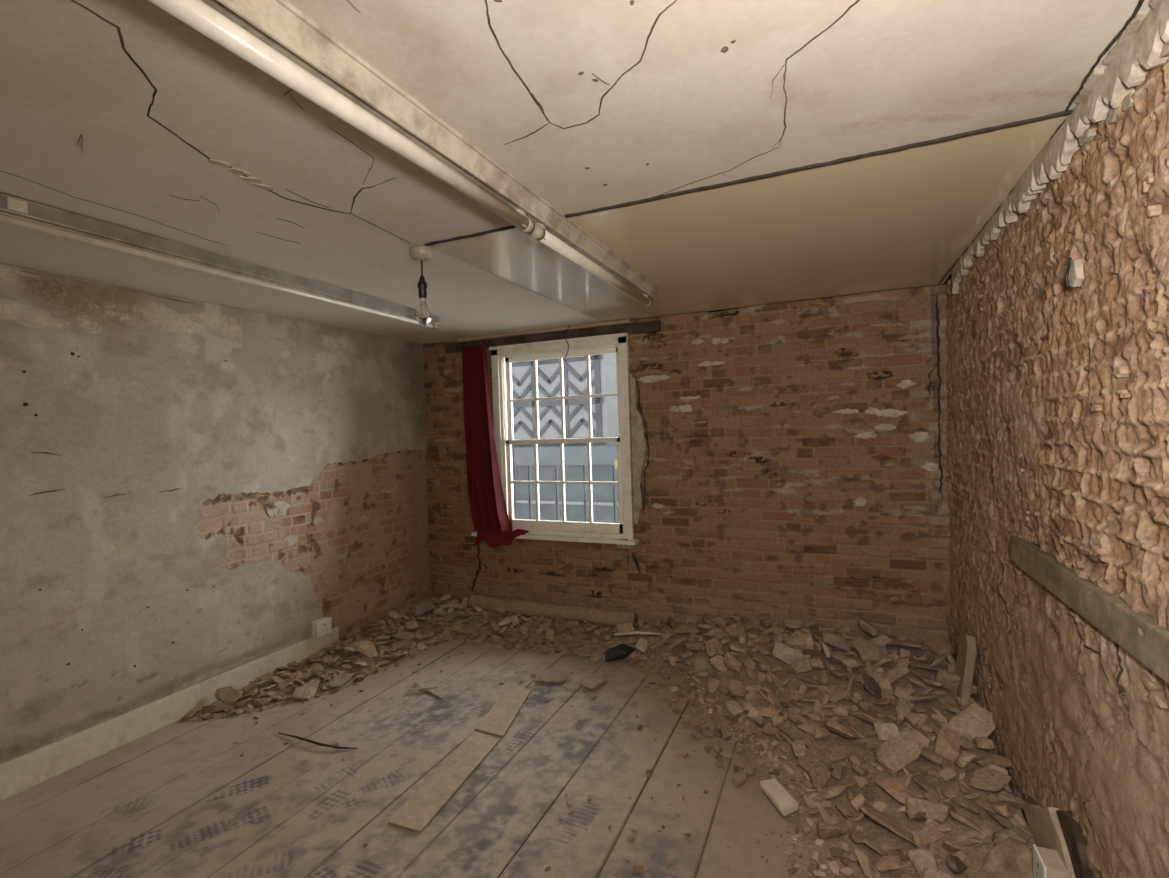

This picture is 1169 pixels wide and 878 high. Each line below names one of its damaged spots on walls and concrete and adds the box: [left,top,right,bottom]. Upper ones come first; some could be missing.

crack [1,171,226,246]
crack [71,0,516,246]
crack [485,0,677,145]
crack [564,0,1161,218]
spalling [1143,173,1162,217]
crack [928,186,1015,500]
spalling [1112,365,1134,398]
flaking render [194,447,432,641]